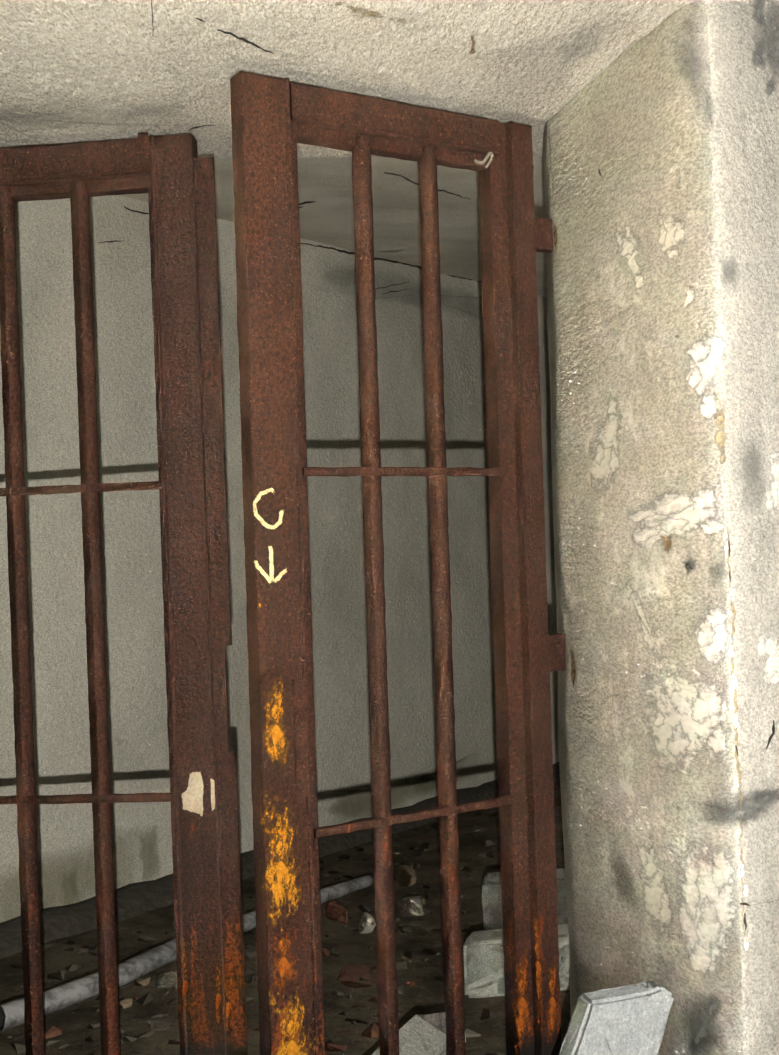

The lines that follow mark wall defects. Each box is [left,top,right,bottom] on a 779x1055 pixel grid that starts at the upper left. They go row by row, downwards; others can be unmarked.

crack [196,18,274,54]
corrosion [261,796,310,1055]